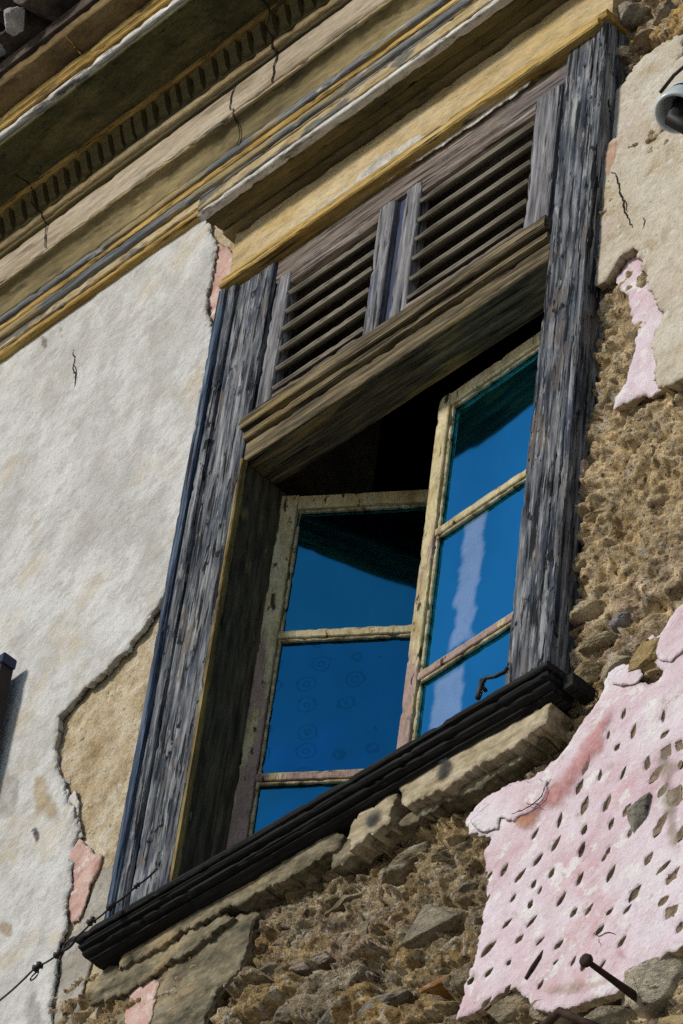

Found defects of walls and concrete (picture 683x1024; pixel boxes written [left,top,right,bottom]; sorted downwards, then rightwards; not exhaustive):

crack [262,0,278,82]
flaking render [615,0,683,76]
crack [229,86,240,145]
flaking render [628,128,669,154]
crack [14,174,47,248]
crack [611,172,645,229]
flaking render [209,225,234,323]
peeling [210,256,683,1024]
flaking render [48,609,198,1024]
crack [512,781,550,814]